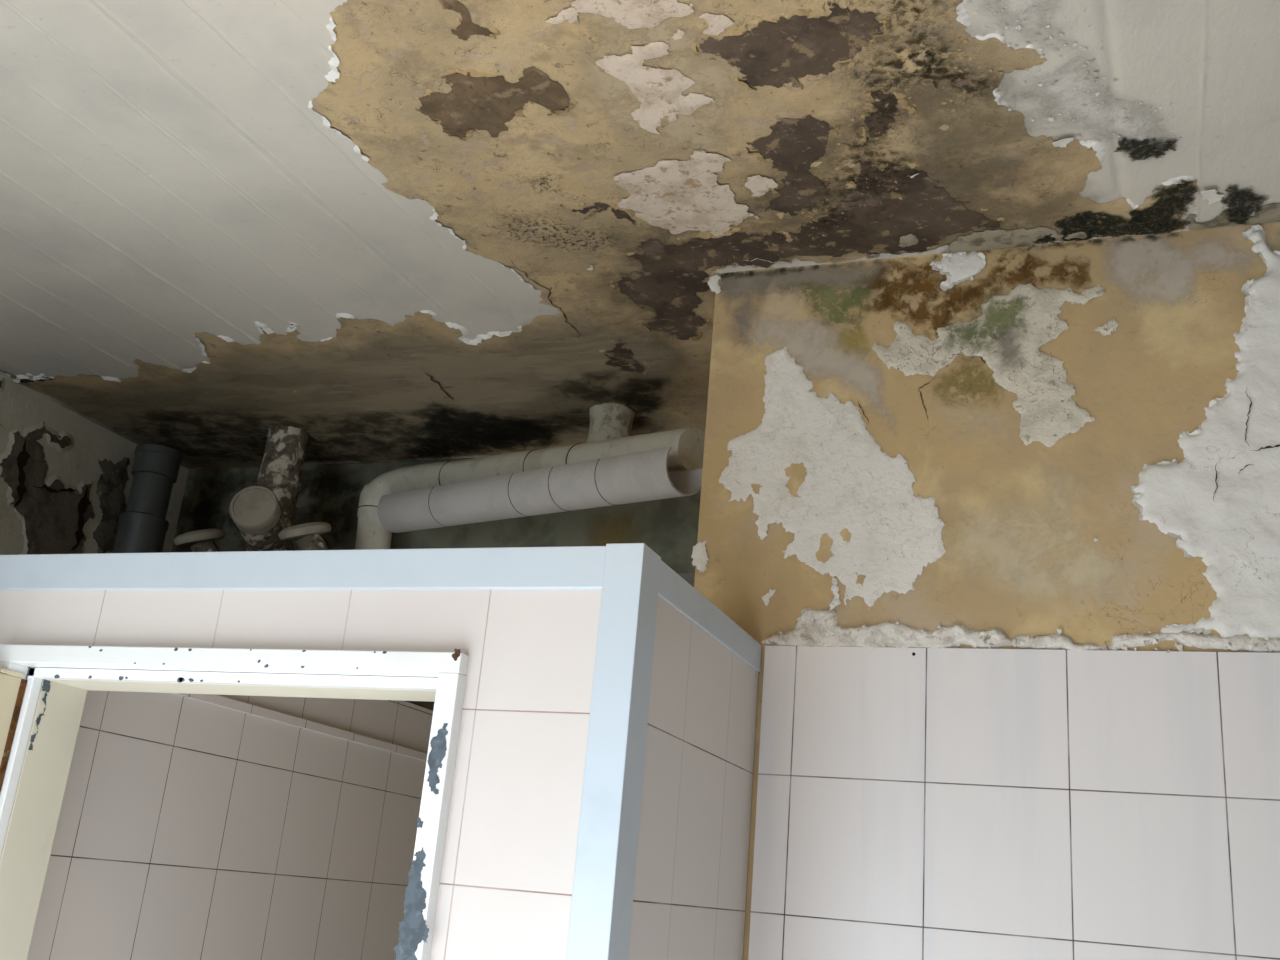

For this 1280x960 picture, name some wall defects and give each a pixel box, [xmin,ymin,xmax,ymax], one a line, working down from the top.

peeling [0,0,1224,447]
damp [821,0,987,224]
damp [1028,180,1251,302]
damp [1115,138,1177,161]
damp [1221,186,1267,224]
damp [720,264,885,405]
damp [949,299,1024,361]
flaking render [0,422,130,555]
damp [43,330,676,547]
peeling [304,437,588,463]
flaking render [719,225,1280,653]
crack [1213,385,1280,500]